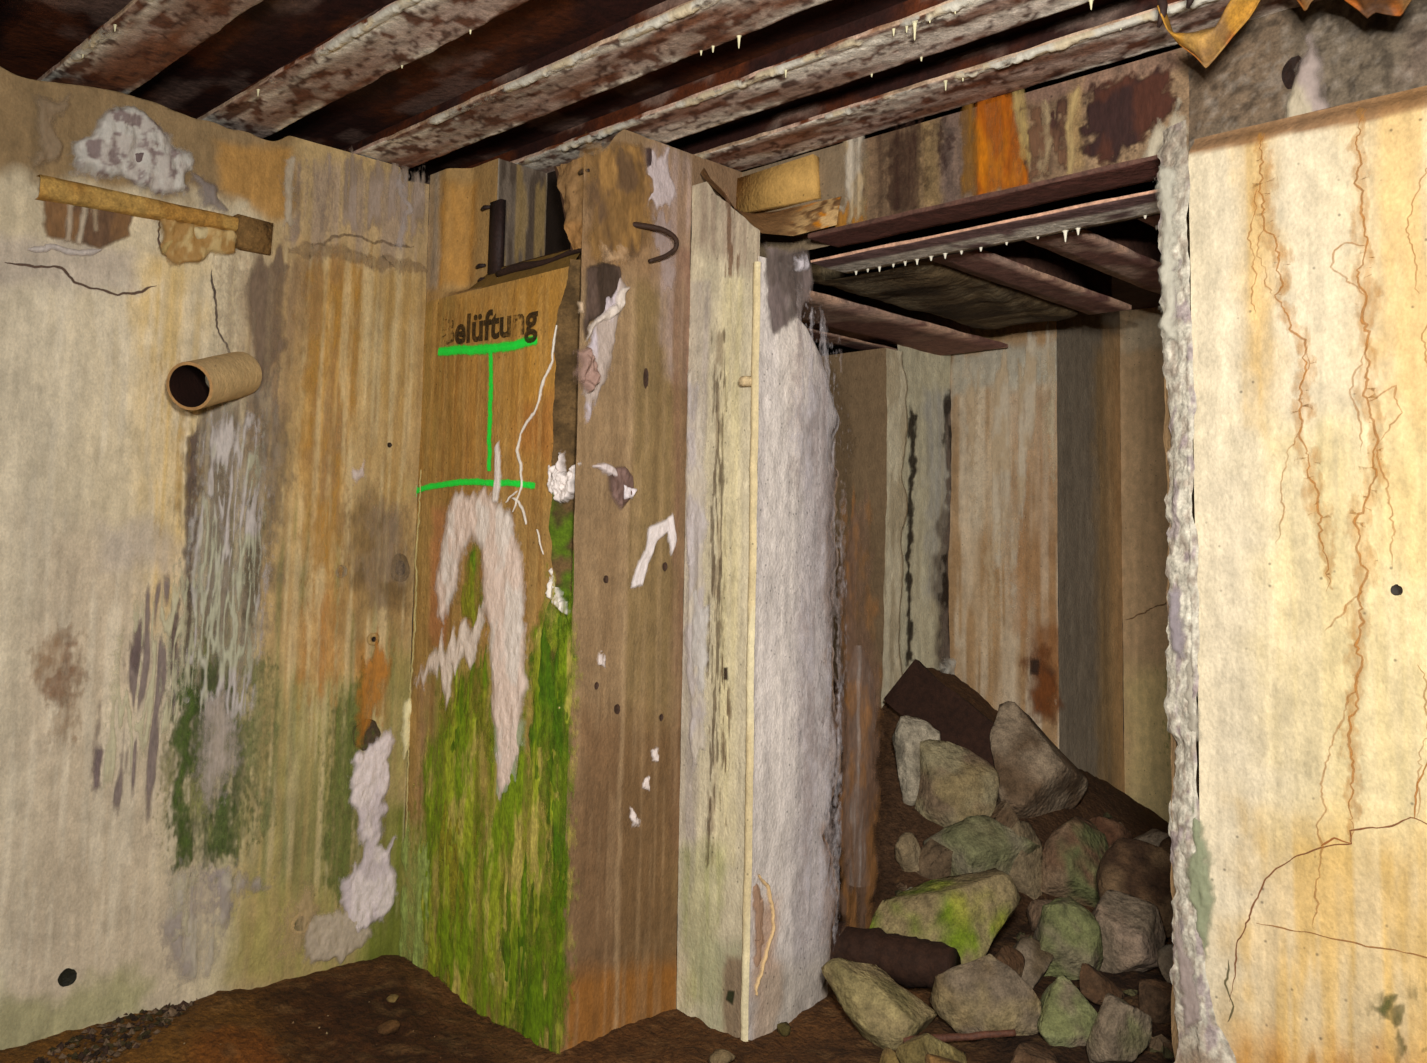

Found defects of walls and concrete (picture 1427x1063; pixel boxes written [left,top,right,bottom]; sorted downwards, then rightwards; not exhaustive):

crack [5,221,166,296]
spalling [44,201,132,248]
spalling [34,96,227,211]
crack [211,271,230,353]
leakage [168,157,299,799]
leakage [328,153,425,247]
spalling [542,144,654,668]
corrosion [938,66,1181,195]
corrosion [1258,136,1331,591]
corrosion [1347,109,1379,839]
leakage [306,442,528,964]
crack [1224,763,1427,1021]